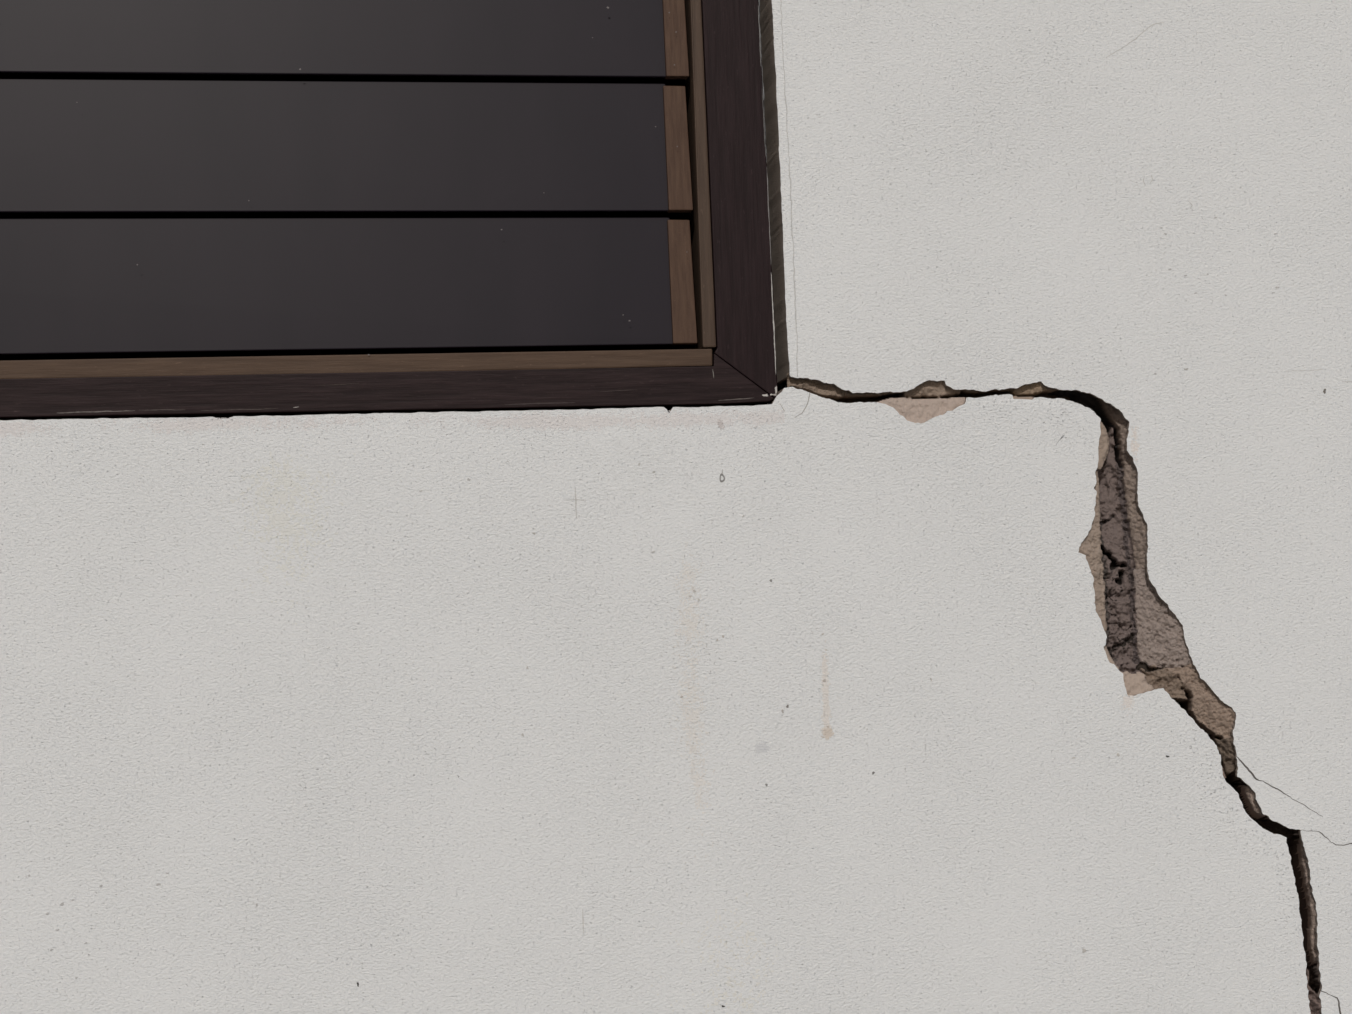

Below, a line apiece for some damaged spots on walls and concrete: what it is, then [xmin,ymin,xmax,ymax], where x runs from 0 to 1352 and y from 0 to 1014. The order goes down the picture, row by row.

peeling [879,380,965,423]
crack [780,2,1352,1014]
spalling [1079,399,1266,819]